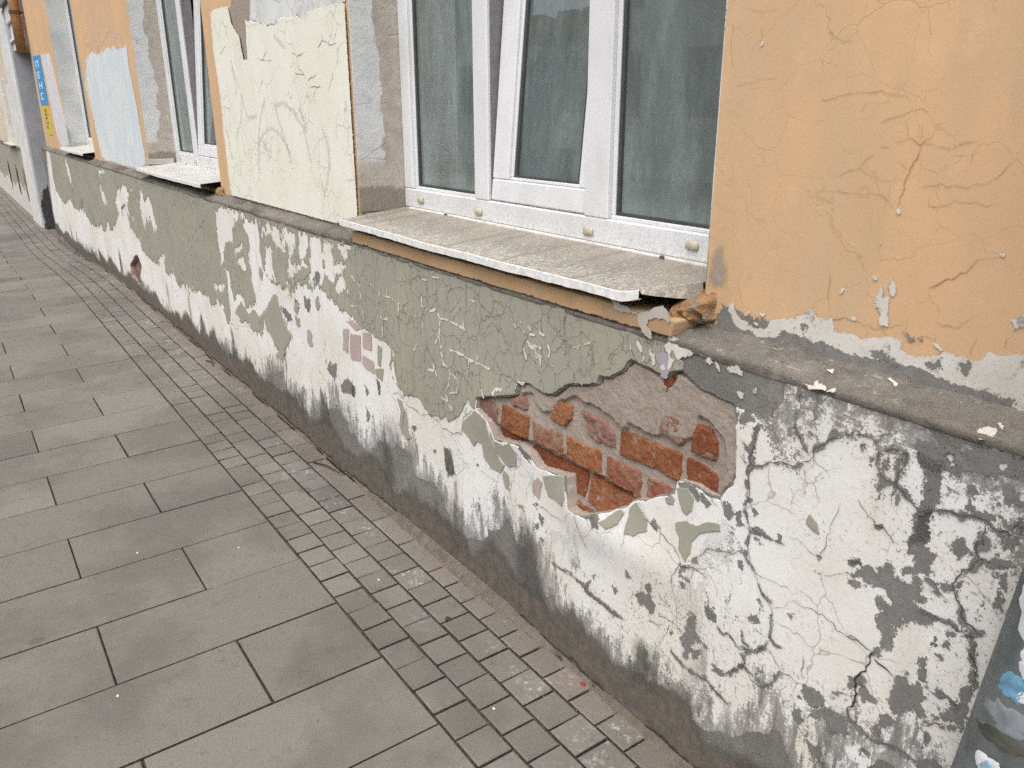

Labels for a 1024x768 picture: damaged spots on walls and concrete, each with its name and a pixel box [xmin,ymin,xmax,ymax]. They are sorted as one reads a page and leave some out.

peeling [230,0,345,60]
crack [815,90,1011,217]
crack [827,256,1000,354]
crack [136,292,397,512]
leakage [41,186,749,768]
peeling [46,151,1024,768]
crack [519,614,607,694]
crack [551,562,623,619]
crack [641,385,1024,768]